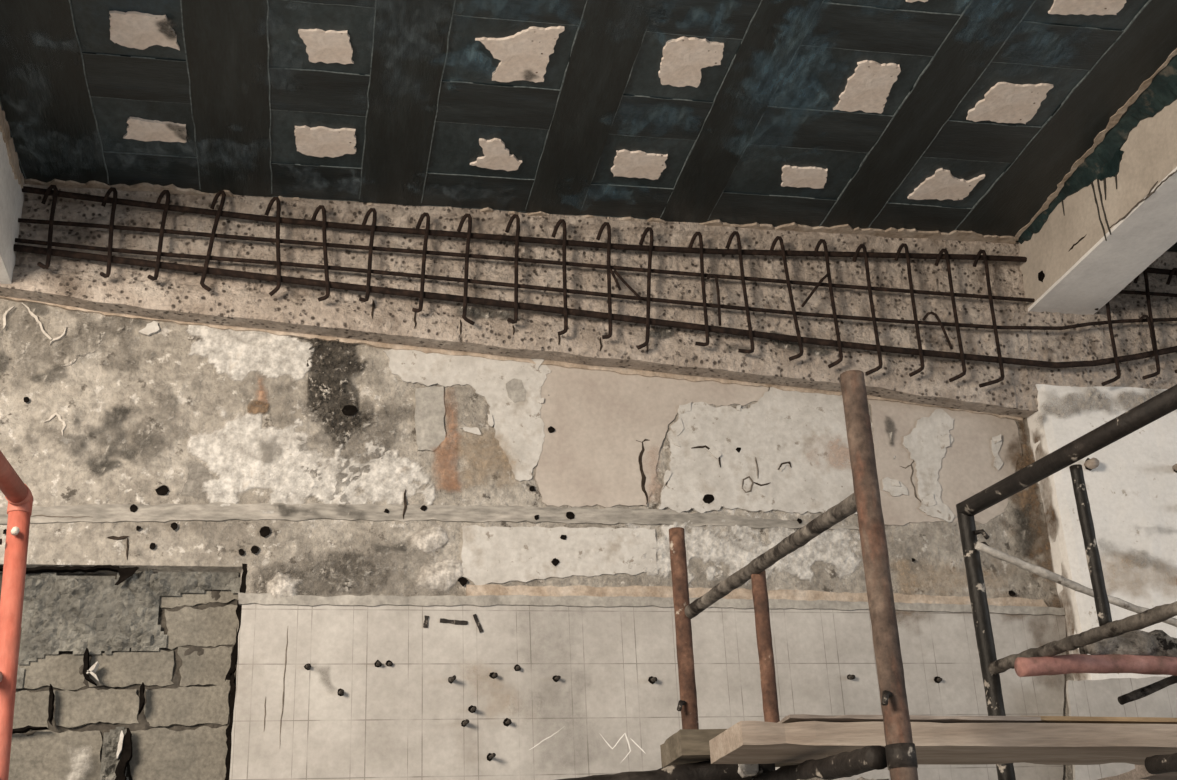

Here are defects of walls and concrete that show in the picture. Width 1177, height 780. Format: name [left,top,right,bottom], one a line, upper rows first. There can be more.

peeling [109,11,180,51]
peeling [475,26,565,83]
peeling [611,149,668,180]
peeling [658,36,724,88]
peeling [833,60,901,114]
peeling [966,82,1054,124]
leakage [1018,55,1177,244]
spalling [3,185,1177,423]
flaking render [383,349,551,482]
flaking render [658,387,854,515]
crack [225,563,248,780]
crack [115,682,145,780]